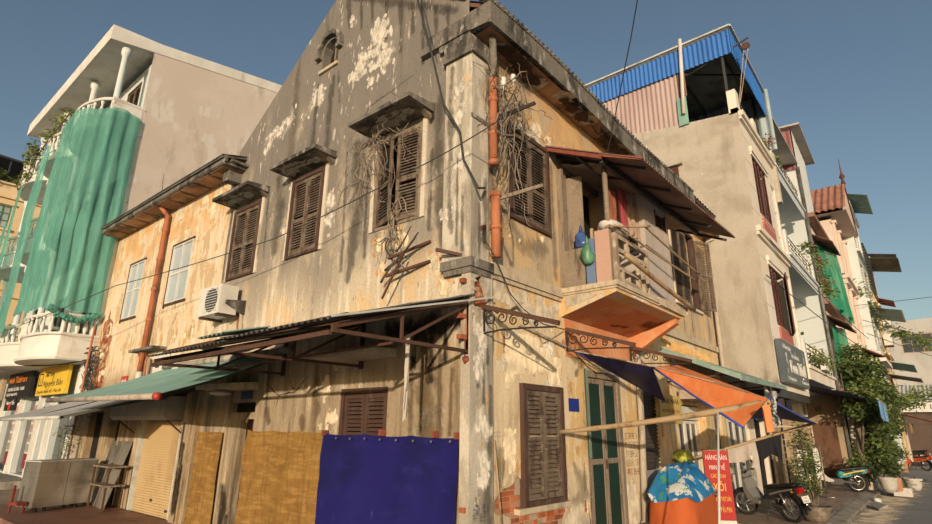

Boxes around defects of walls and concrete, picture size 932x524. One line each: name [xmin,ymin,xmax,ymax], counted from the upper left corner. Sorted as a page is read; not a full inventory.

flaking render [348,13,395,90]
peeling [427,250,602,390]
flaking render [459,405,493,513]
flaking render [493,396,590,524]